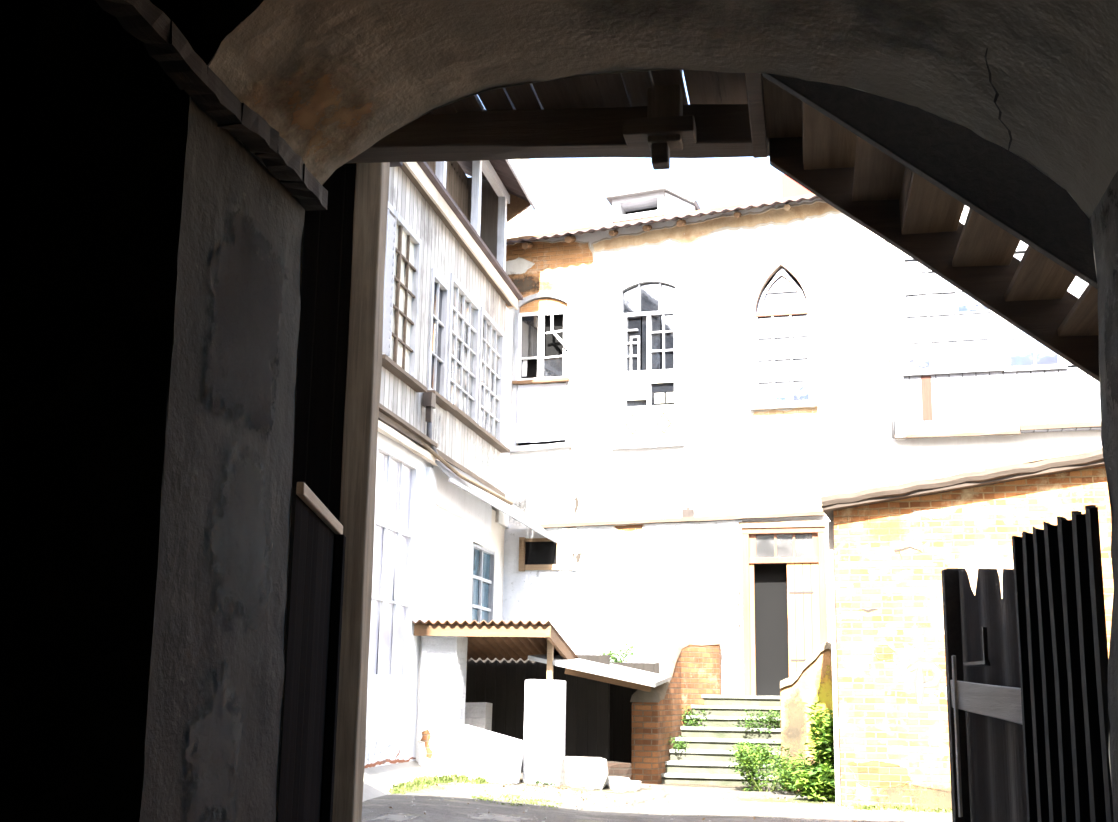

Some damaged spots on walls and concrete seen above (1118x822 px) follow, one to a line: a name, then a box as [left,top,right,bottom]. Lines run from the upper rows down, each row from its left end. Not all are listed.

crack [984,48,1012,150]
flaking render [506,200,841,455]
flaking render [745,297,895,514]
crack [878,546,923,559]
flaking render [184,661,244,822]
spalling [848,759,913,788]